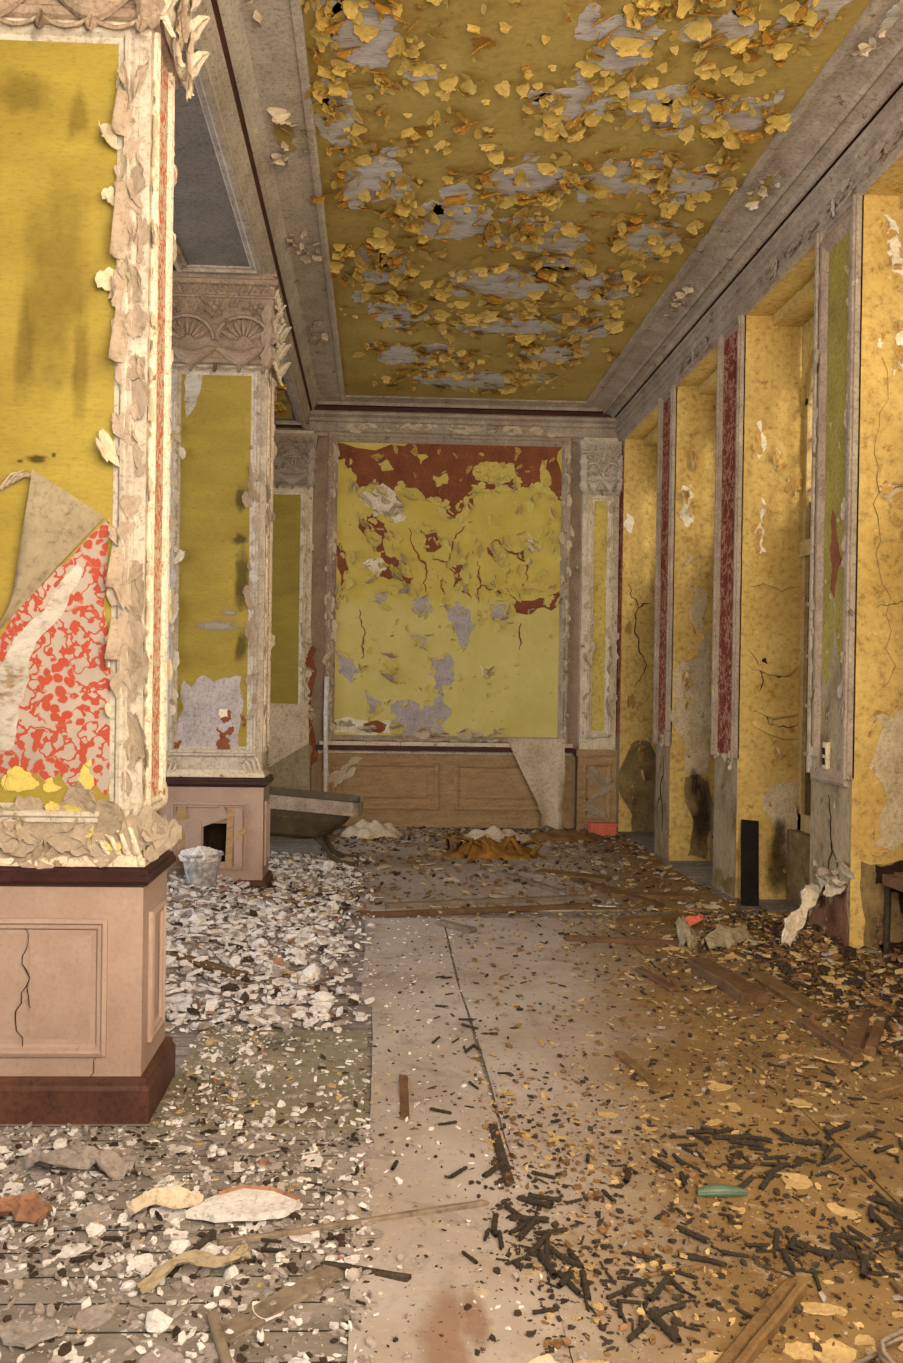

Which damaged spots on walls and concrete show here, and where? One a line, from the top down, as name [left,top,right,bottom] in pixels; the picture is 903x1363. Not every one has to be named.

peeling [173,0,194,101]
peeling [851,0,903,62]
peeling [266,0,853,395]
peeling [751,112,903,290]
peeling [0,56,293,869]
crack [409,521,530,650]
peeling [298,422,669,832]
peeling [679,427,701,593]
peeling [809,490,847,769]
peeling [763,781,798,873]
peeling [804,701,903,960]
crack [15,929,31,1047]